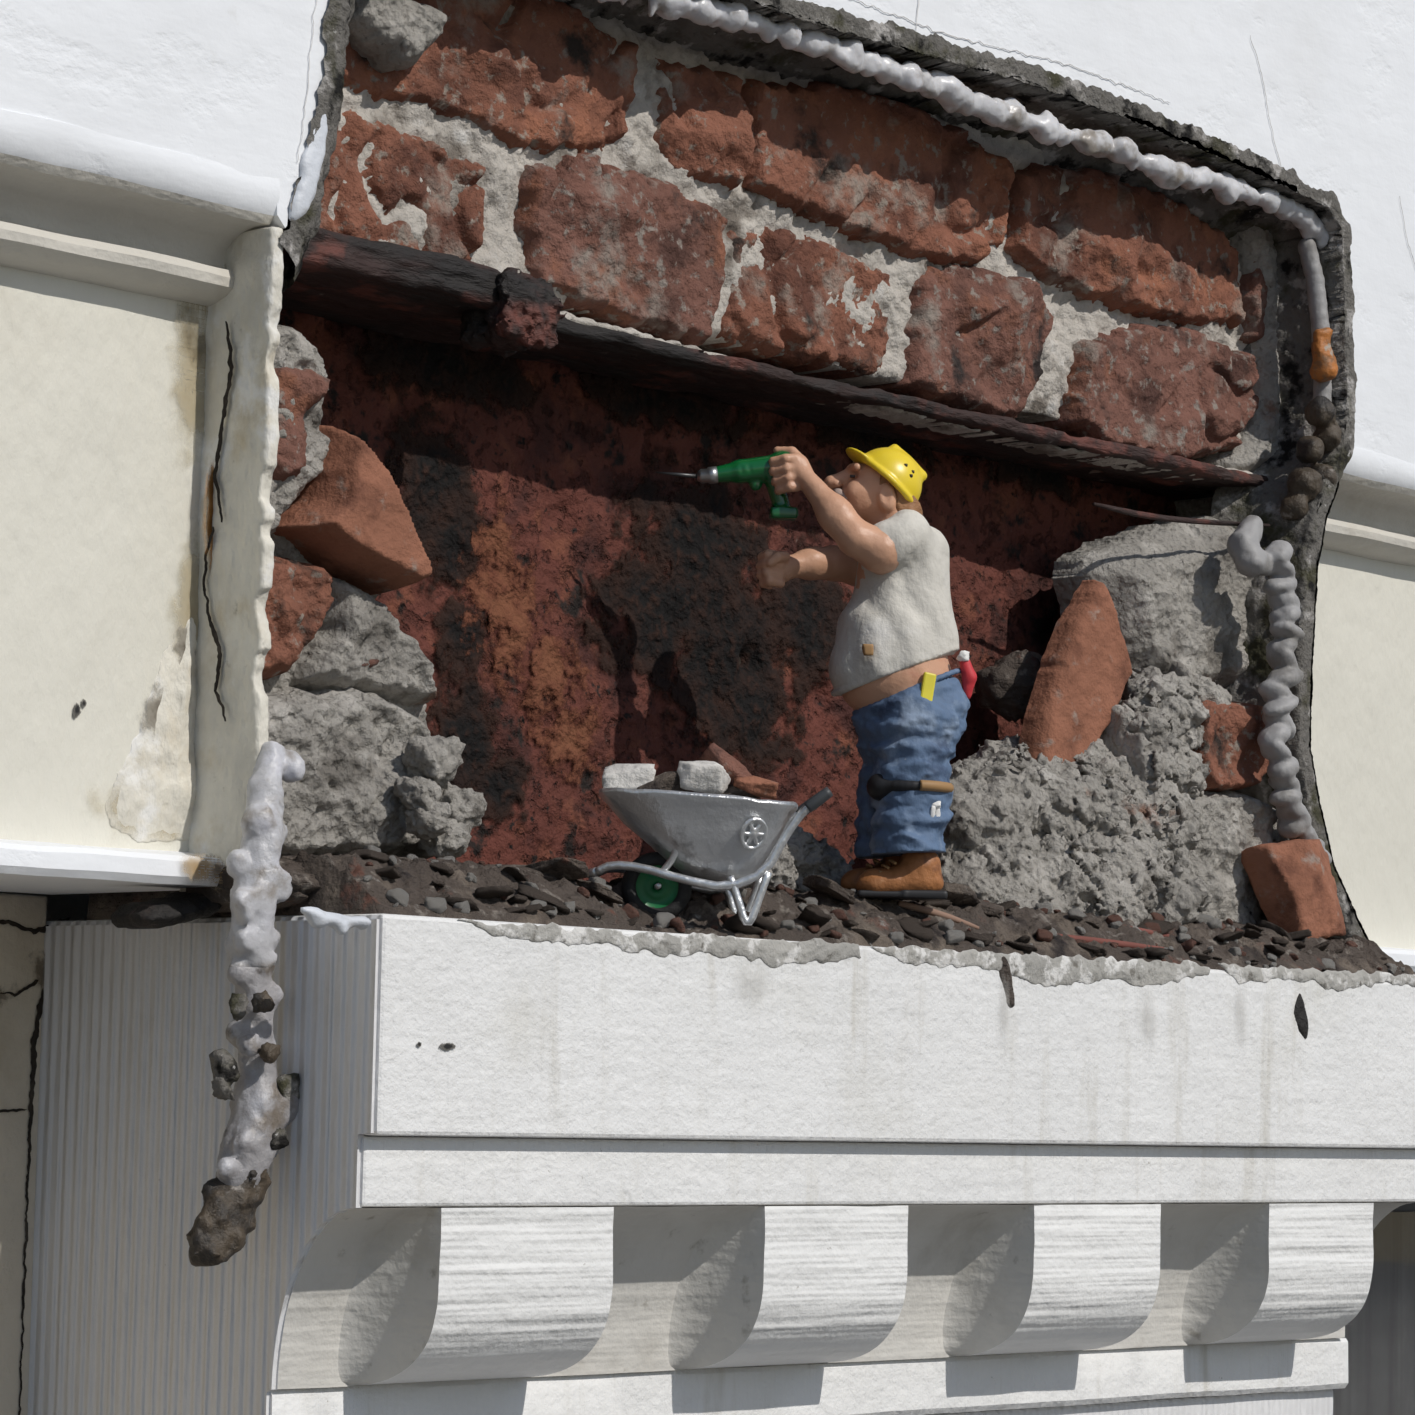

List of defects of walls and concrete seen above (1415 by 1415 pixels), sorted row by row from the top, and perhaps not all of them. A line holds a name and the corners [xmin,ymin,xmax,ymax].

crack [202,321,234,721]
spalling [188,0,487,867]
water stain [335,327,542,829]
water stain [566,369,1093,777]
spalling [554,0,1369,940]
crack [0,917,71,935]
peeling [300,907,371,935]
peeling [458,918,1415,992]
crack [0,979,44,1415]